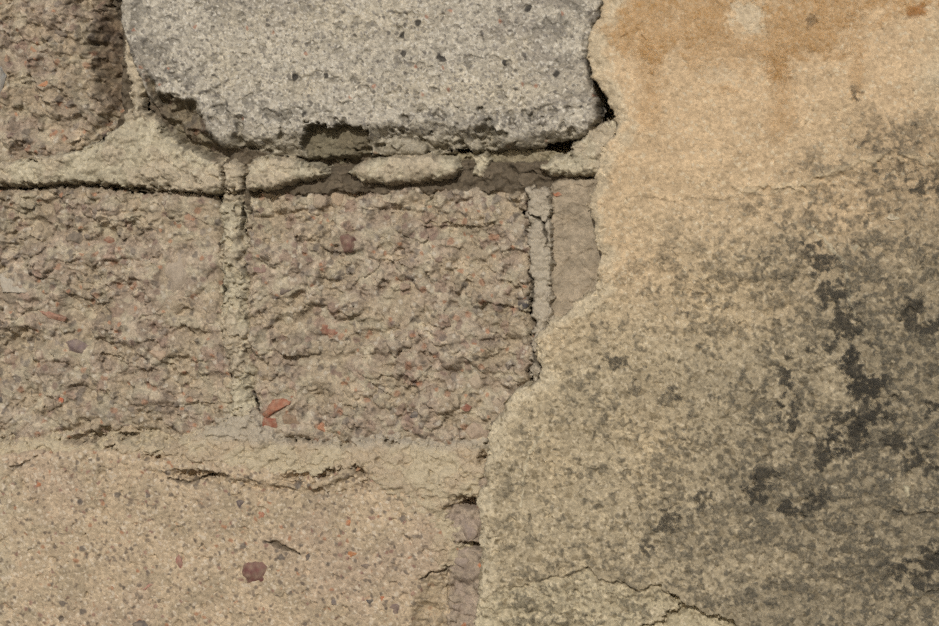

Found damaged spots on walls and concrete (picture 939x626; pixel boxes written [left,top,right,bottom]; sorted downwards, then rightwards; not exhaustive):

crack [527,209,554,250]
crack [527,269,536,307]
crack [167,472,220,486]
crack [524,566,661,607]
crack [874,587,939,626]